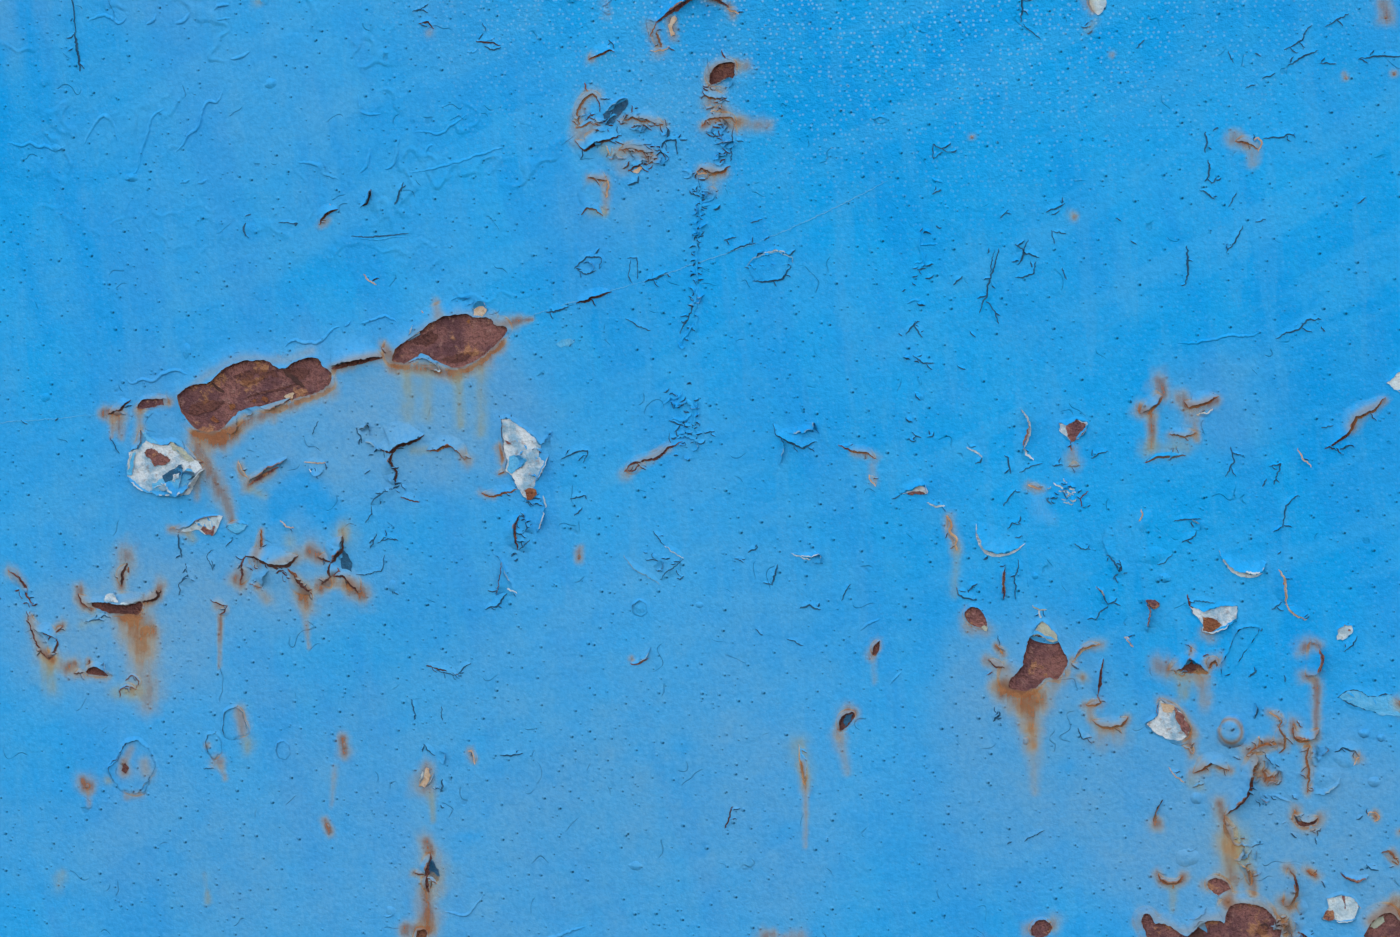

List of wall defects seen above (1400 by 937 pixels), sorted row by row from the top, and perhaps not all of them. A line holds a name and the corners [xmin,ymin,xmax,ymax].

rust [704,50,738,88]
rust [381,297,529,378]
peeling [109,429,204,497]
rust [136,342,338,492]
peeling [482,414,554,501]
rust [962,603,1083,745]
peeling [1183,594,1263,678]
peeling [1145,698,1195,754]
peeling [1291,720,1361,792]
rust [1131,837,1287,937]
peeling [1271,850,1399,937]
rust [1337,902,1400,937]